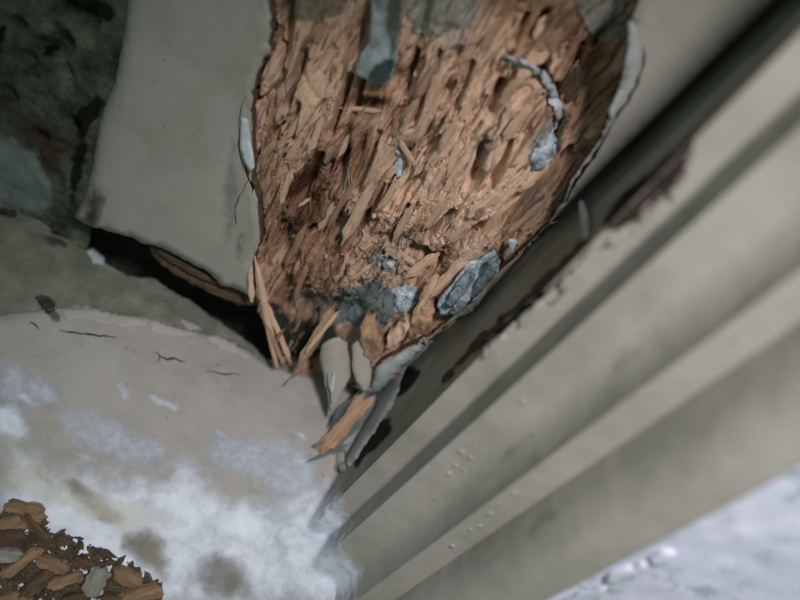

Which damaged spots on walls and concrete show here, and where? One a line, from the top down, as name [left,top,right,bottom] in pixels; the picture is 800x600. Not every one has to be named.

leakage [64,0,114,21]
peeling [354,0,475,84]
leakage [70,96,103,202]
peeling [437,0,645,383]
peeling [333,252,420,328]
crack [59,330,116,338]
leakage [0,367,58,438]
leakage [67,416,163,463]
peeling [320,336,372,417]
peeling [354,417,391,468]
peeling [397,366,420,396]
leakage [3,431,360,600]